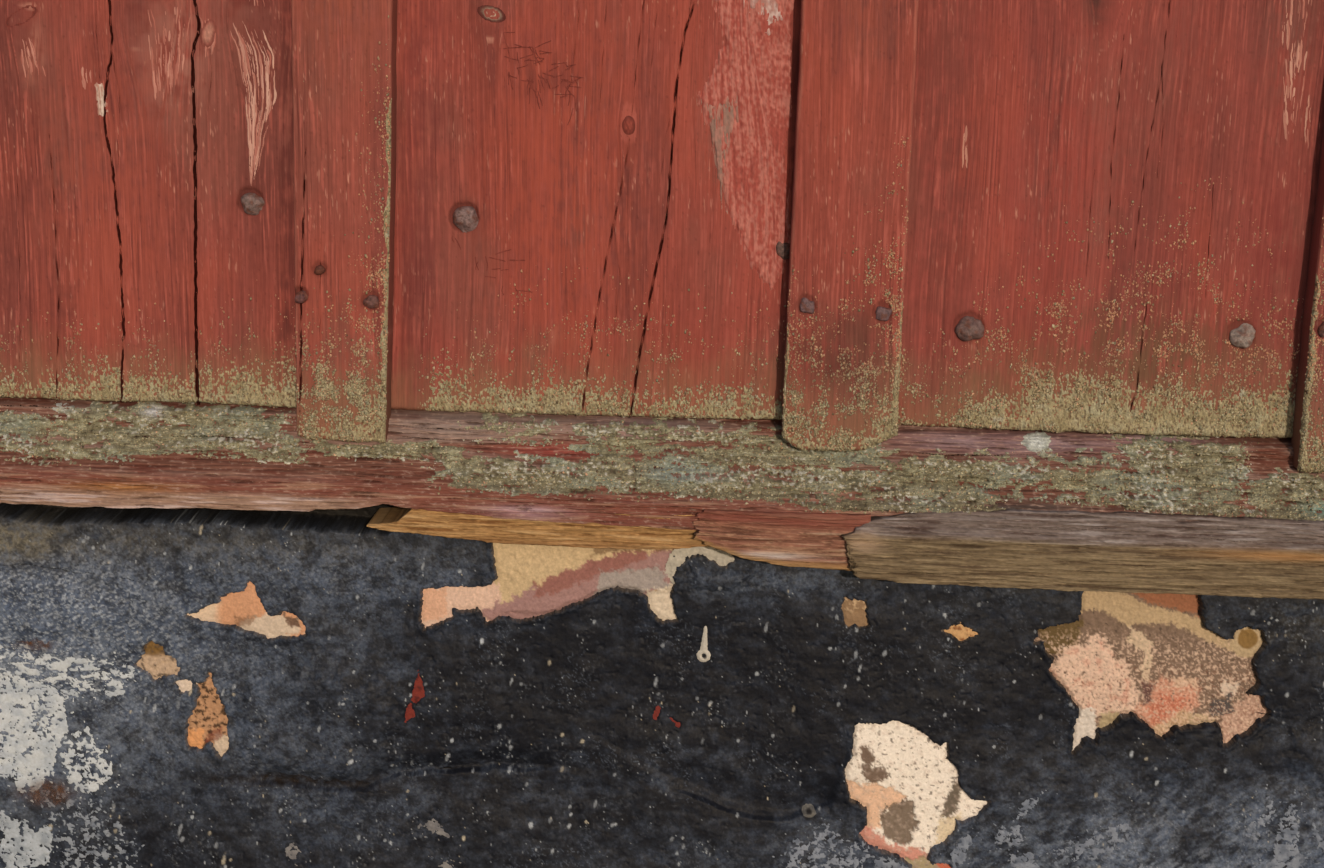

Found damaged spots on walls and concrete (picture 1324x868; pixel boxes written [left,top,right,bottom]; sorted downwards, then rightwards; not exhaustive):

crack [1,0,321,444]
crack [574,2,694,417]
peeling [697,0,795,291]
spalling [187,581,306,639]
spalling [421,543,735,628]
spalling [1034,591,1268,750]
peeling [0,641,229,868]
spalling [772,720,1155,868]
peeling [1236,784,1324,868]